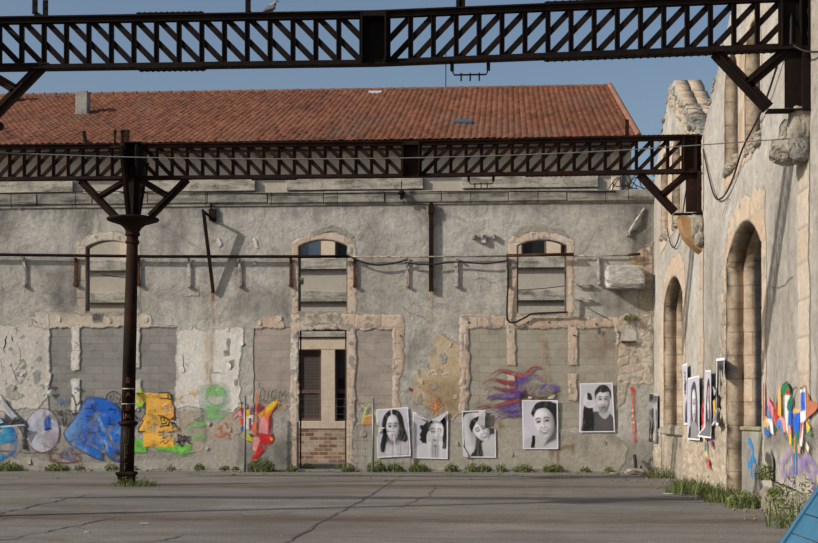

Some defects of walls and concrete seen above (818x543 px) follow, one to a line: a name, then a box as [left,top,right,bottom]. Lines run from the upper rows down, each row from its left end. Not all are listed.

flaking render [0,311,124,411]
flaking render [134,313,285,470]
flaking render [353,335,629,471]
flaking render [0,456,120,470]
crack [284,474,404,543]